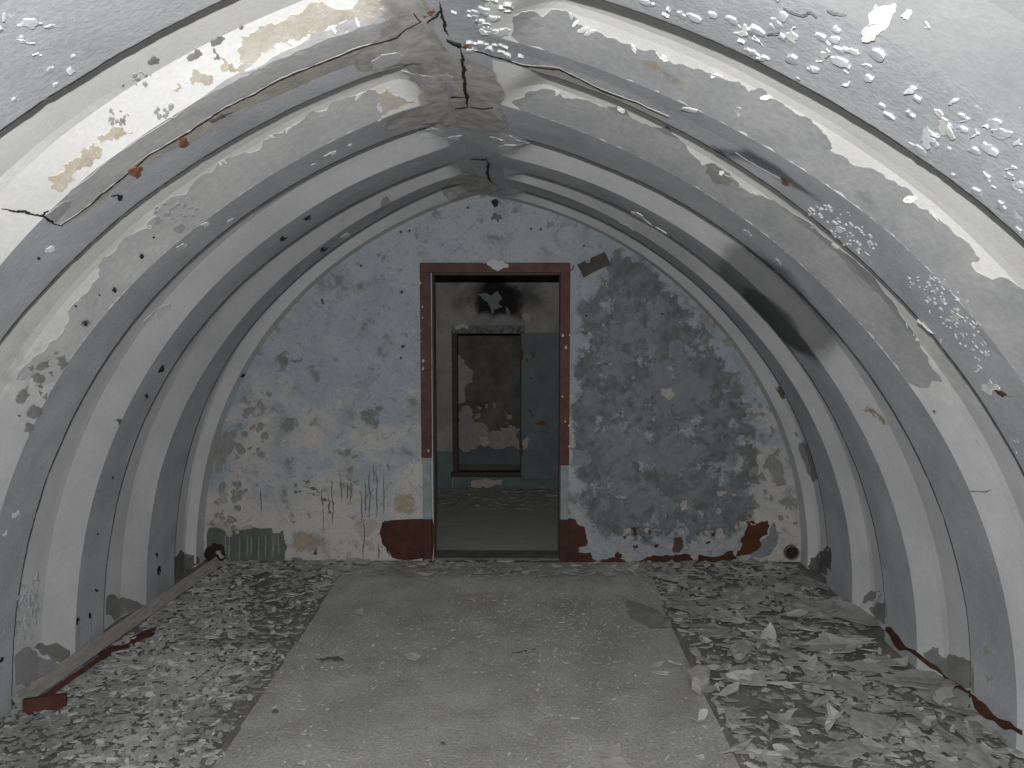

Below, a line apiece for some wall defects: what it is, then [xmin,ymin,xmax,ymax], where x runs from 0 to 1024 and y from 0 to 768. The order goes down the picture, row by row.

peeling [46,54,76,88]
peeling [15,88,416,434]
peeling [60,42,374,227]
peeling [154,0,385,120]
crack [1,2,669,226]
peeling [451,0,1024,395]
peeling [565,420,591,466]
spalling [717,371,798,525]
peeling [794,432,818,481]
peeling [615,522,756,562]